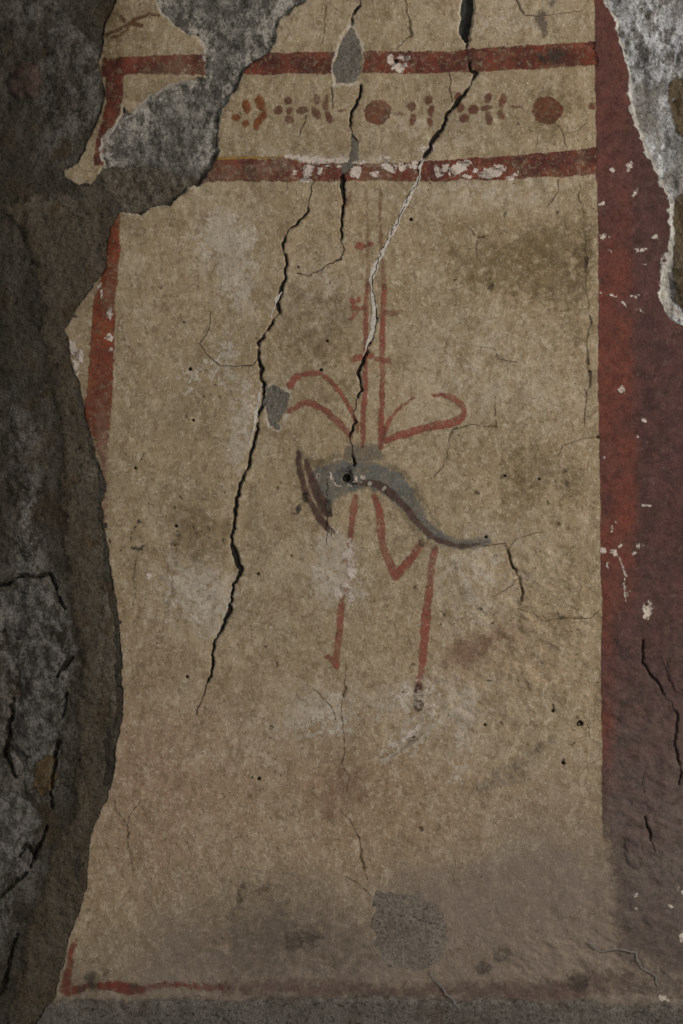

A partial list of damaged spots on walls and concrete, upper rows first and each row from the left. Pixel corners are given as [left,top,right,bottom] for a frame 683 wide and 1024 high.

spalling [332,22,362,84]
peeling [284,143,519,183]
spalling [603,0,683,325]
crack [349,44,478,466]
crack [197,84,362,715]
crack [434,396,497,477]
spalling [0,0,305,1024]
crack [485,532,600,622]
crack [641,640,683,785]